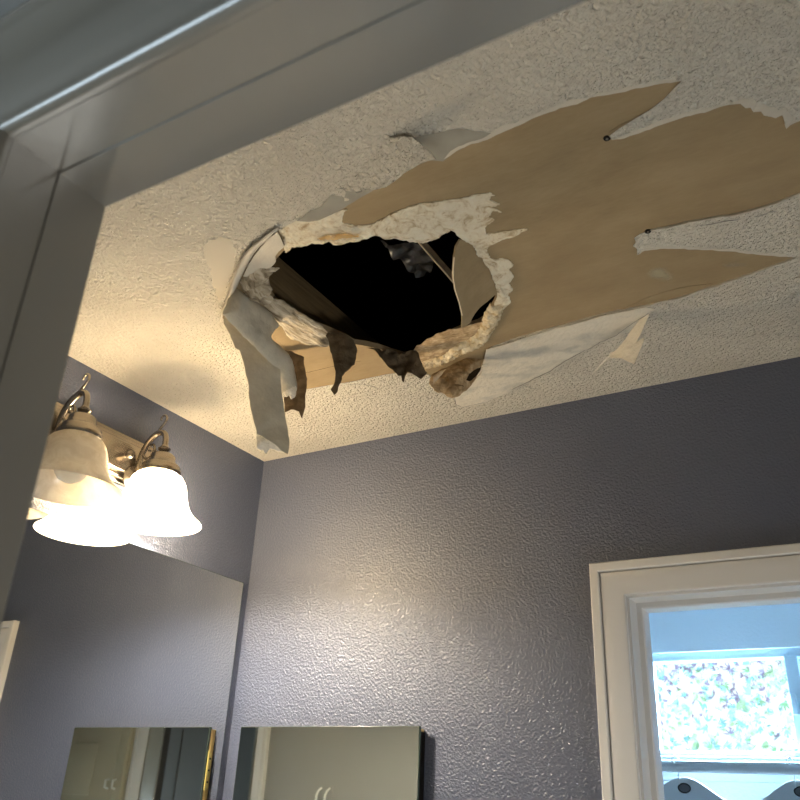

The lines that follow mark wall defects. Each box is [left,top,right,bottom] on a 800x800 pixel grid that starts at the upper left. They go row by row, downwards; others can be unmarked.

peeling [297,187,373,222]
peeling [454,307,655,407]
peeling [385,374,435,396]